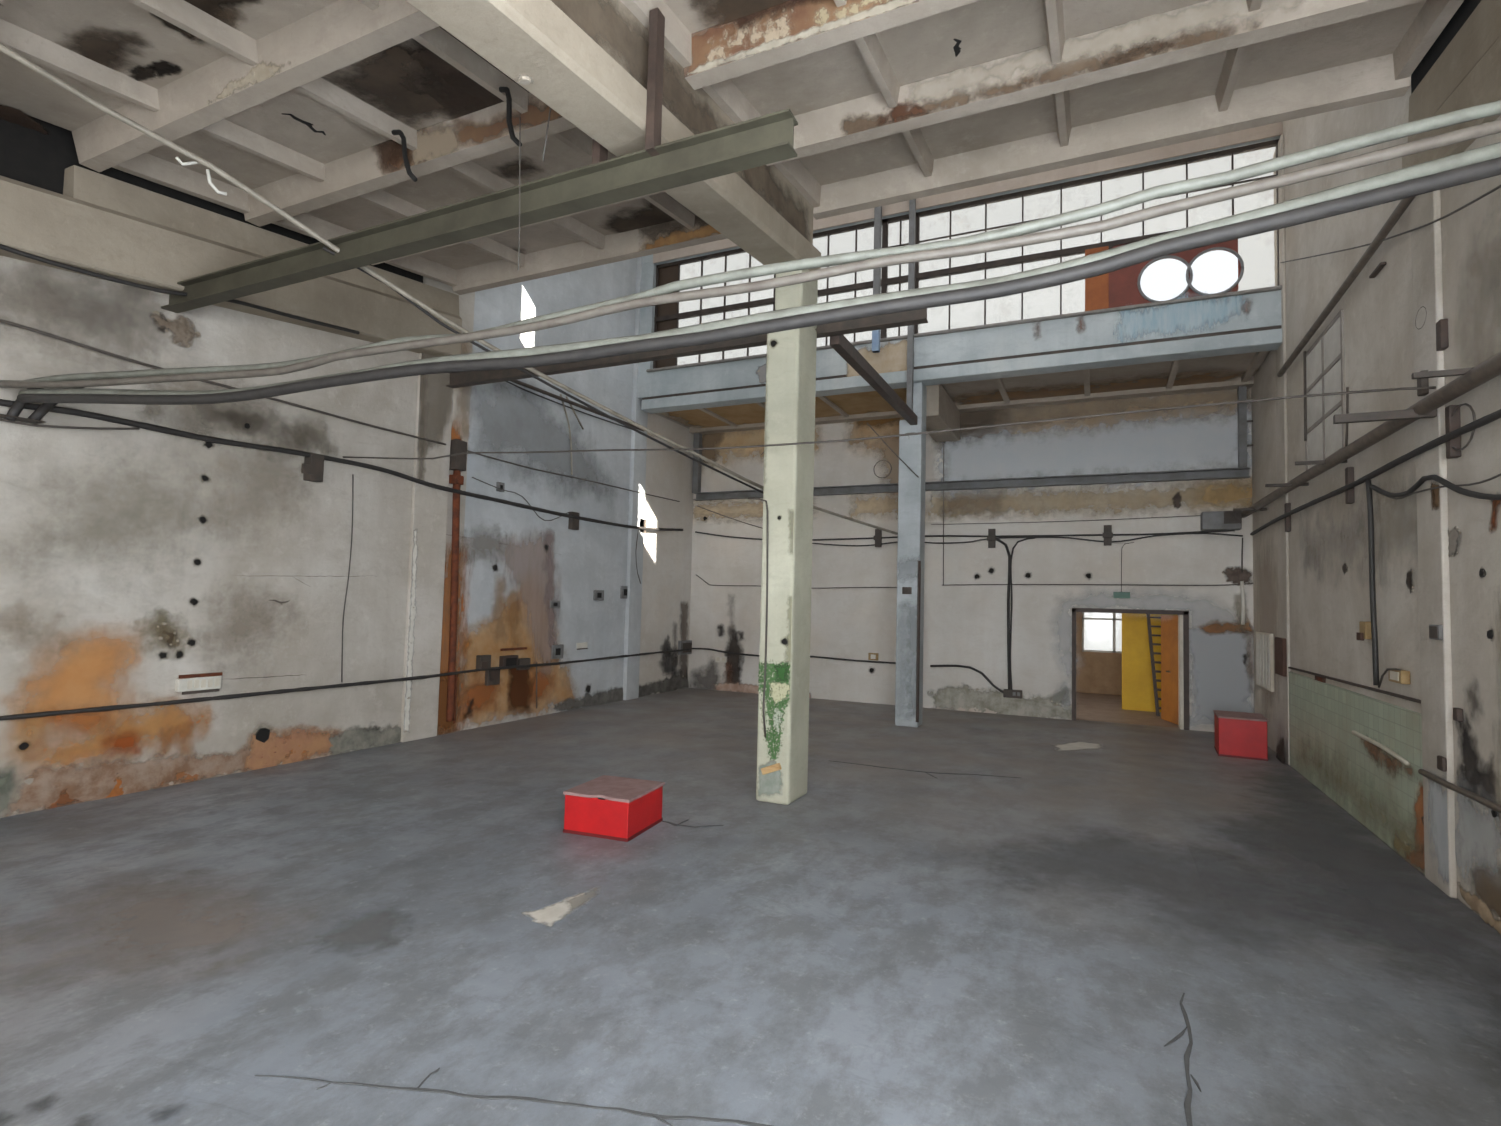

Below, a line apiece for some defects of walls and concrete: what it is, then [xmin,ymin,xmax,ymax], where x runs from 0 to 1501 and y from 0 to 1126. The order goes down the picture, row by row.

water stain [68,29,145,70]
water stain [692,0,790,26]
spalling [688,0,922,75]
rust [23,636,210,767]
flaking render [6,530,418,817]
rust [437,547,575,734]
flaking render [1457,882,1501,935]
crack [1164,993,1202,1126]